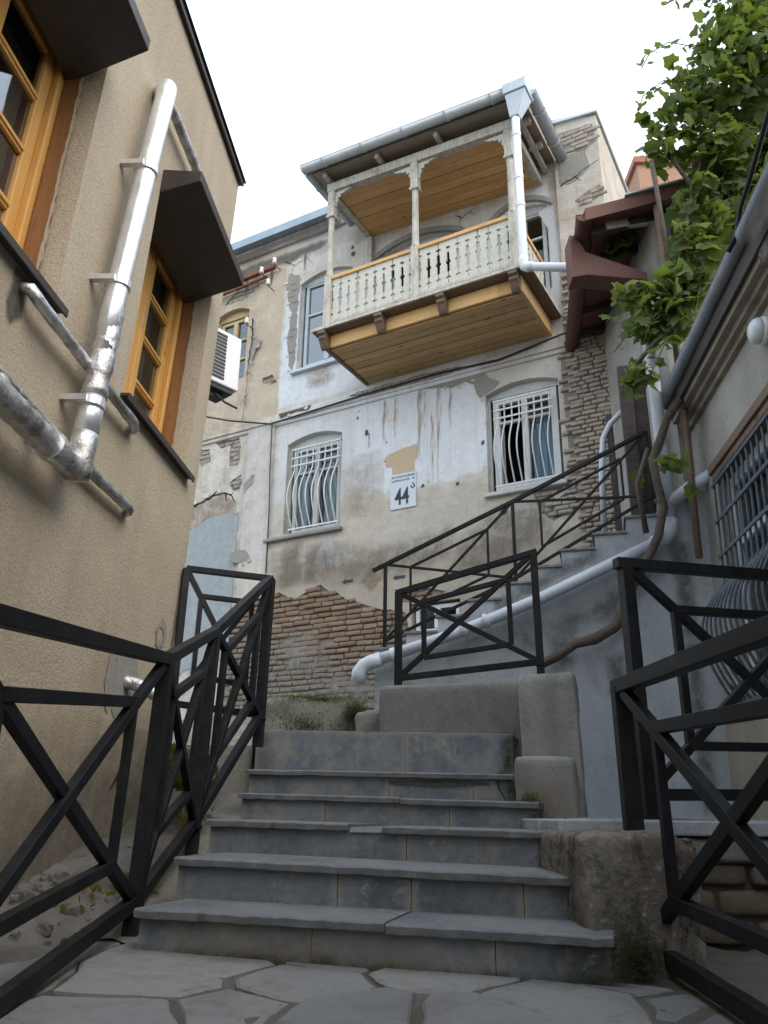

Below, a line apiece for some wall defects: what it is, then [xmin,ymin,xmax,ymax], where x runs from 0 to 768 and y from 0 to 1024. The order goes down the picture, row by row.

flaking render [558,124,600,154]
flaking render [284,274,301,372]
crack [193,489,236,507]
flaking render [192,439,254,521]
flaking render [217,585,445,717]